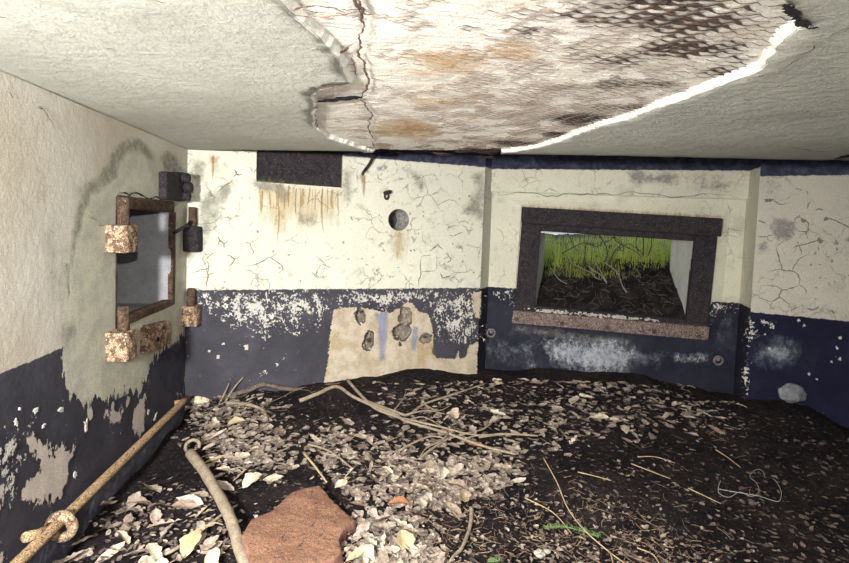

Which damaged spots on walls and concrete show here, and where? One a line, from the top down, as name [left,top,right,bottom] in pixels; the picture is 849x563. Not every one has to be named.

crack [290,0,376,150]
damp [75,141,150,234]
crack [506,169,742,232]
crack [193,237,286,286]
crack [418,232,470,285]
crack [759,188,849,314]
flaking render [193,280,486,383]
damp [546,340,635,371]
peeling [0,407,78,514]
peeling [104,393,157,438]